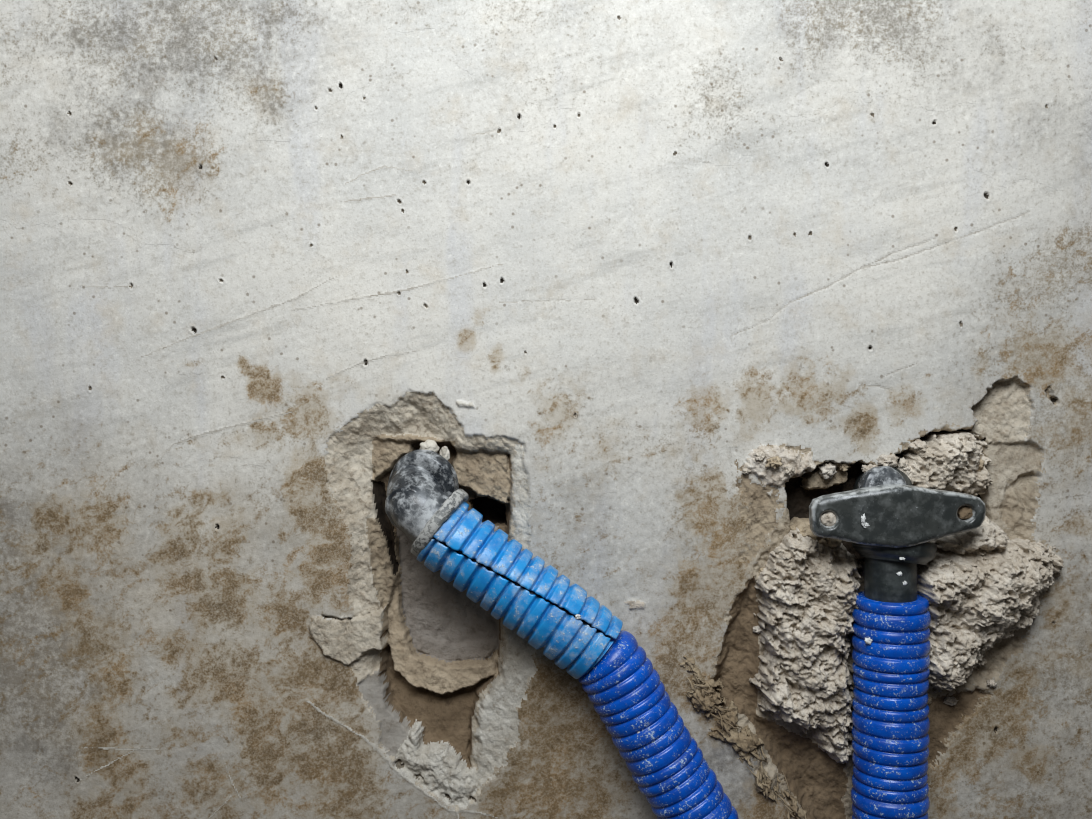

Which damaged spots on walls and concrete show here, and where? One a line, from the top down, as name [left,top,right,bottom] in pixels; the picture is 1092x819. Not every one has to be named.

crack [732,211,1030,336]
leakage [0,431,160,819]
flaking render [310,392,538,812]
flaking render [686,443,876,819]
flaking render [890,377,1047,547]
flaking render [927,626,1030,767]